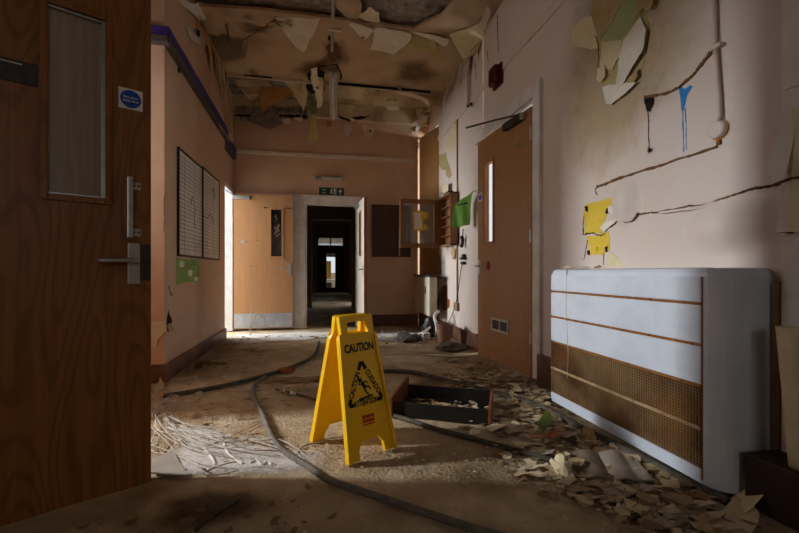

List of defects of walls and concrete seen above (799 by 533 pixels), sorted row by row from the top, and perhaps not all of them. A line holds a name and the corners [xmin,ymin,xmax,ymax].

spalling [306,69,325,94]
peeling [571,0,659,105]
crack [644,51,713,98]
spalling [234,105,308,129]
crack [595,145,718,195]
crack [638,184,781,215]
peeling [571,197,626,269]